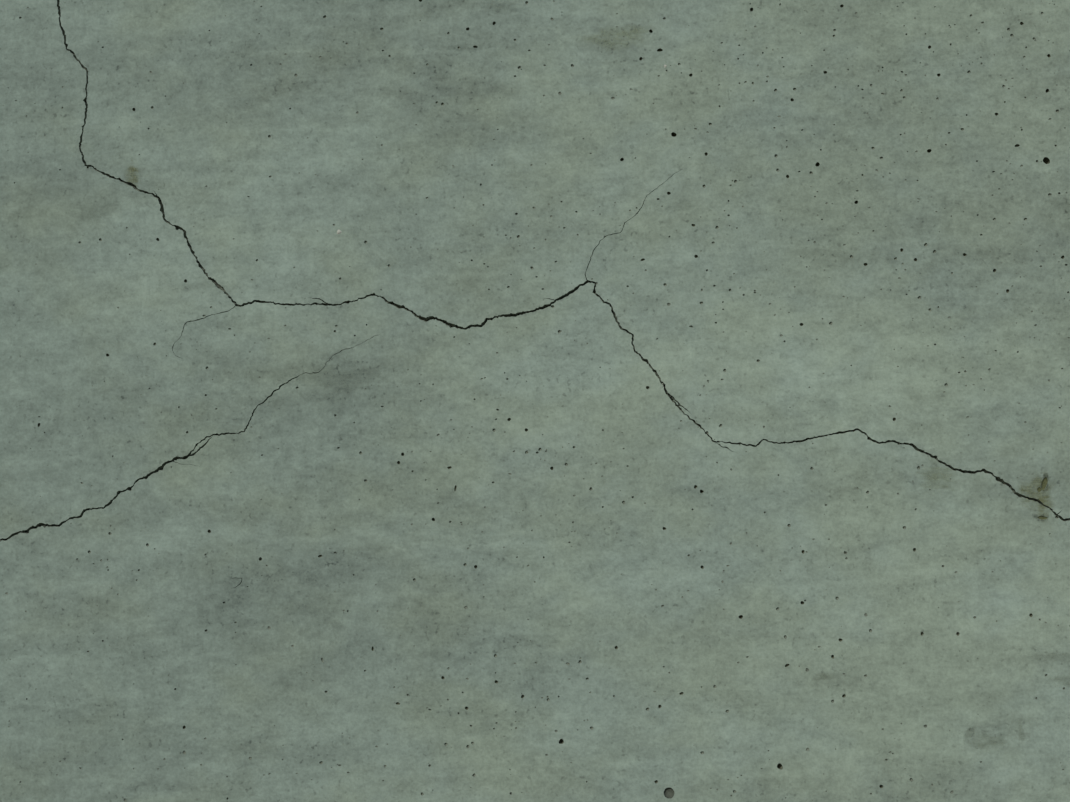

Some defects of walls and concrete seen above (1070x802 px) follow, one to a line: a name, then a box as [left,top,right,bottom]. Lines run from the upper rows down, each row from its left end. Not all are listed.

crack [0,335,376,542]
crack [57,0,1070,521]